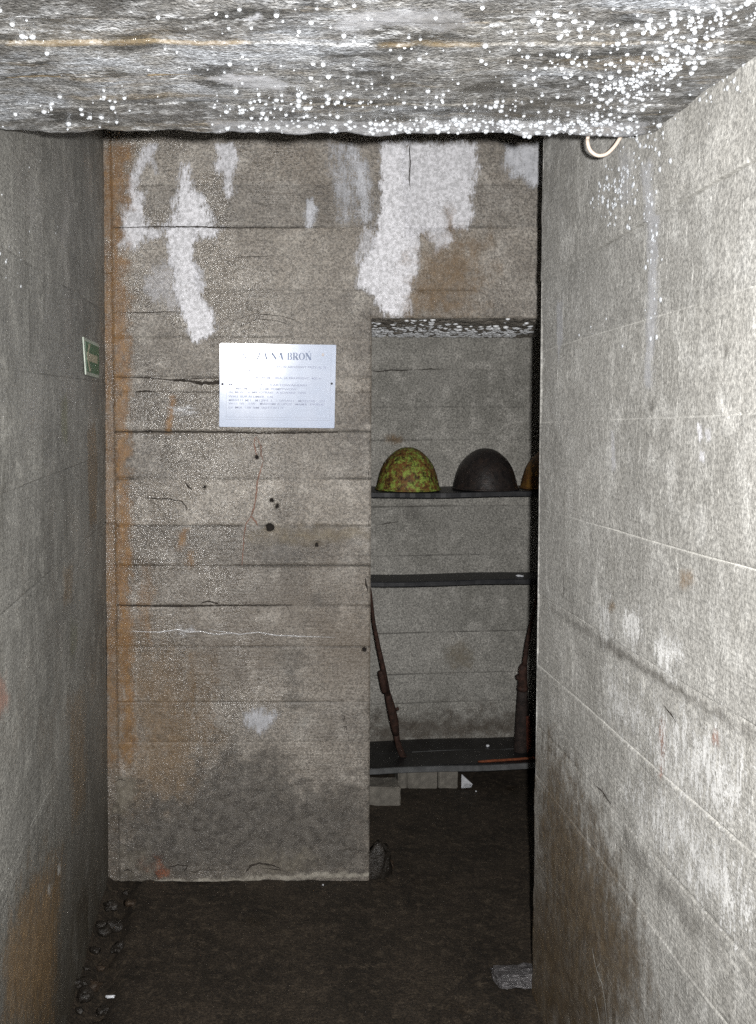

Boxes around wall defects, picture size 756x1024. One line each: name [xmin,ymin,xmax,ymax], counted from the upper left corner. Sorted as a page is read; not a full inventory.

water stain [117,143,219,343]
water stain [214,142,238,198]
water stain [328,139,481,318]
crack [118,430,338,563]